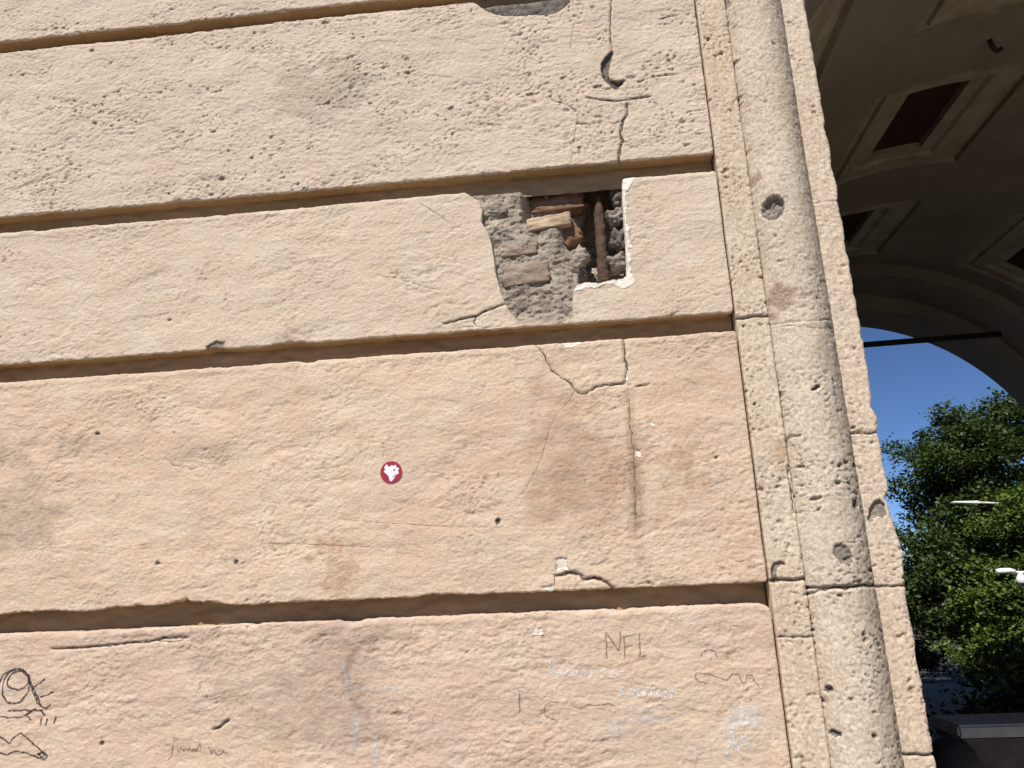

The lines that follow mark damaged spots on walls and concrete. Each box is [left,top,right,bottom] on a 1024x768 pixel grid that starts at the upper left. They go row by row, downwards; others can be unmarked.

crack [551,74,677,162]
spalling [466,177,635,323]
crack [448,303,507,328]
crack [515,339,649,518]
spalling [868,500,886,522]
spalling [832,544,853,564]
crack [552,571,613,591]